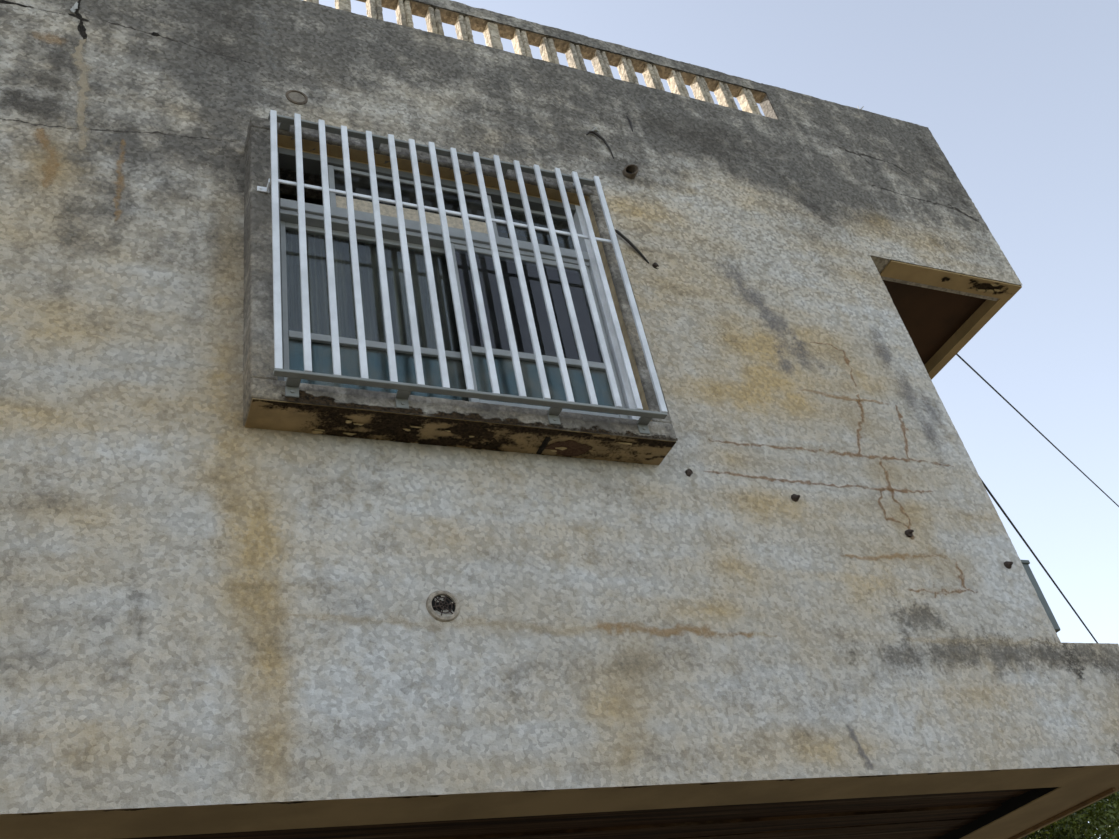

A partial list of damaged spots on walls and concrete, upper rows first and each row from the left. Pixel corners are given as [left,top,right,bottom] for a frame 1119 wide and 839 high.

peeling [968,279,1008,294]
spalling [536,437,595,456]
crack [712,343,954,539]
crack [911,564,972,597]